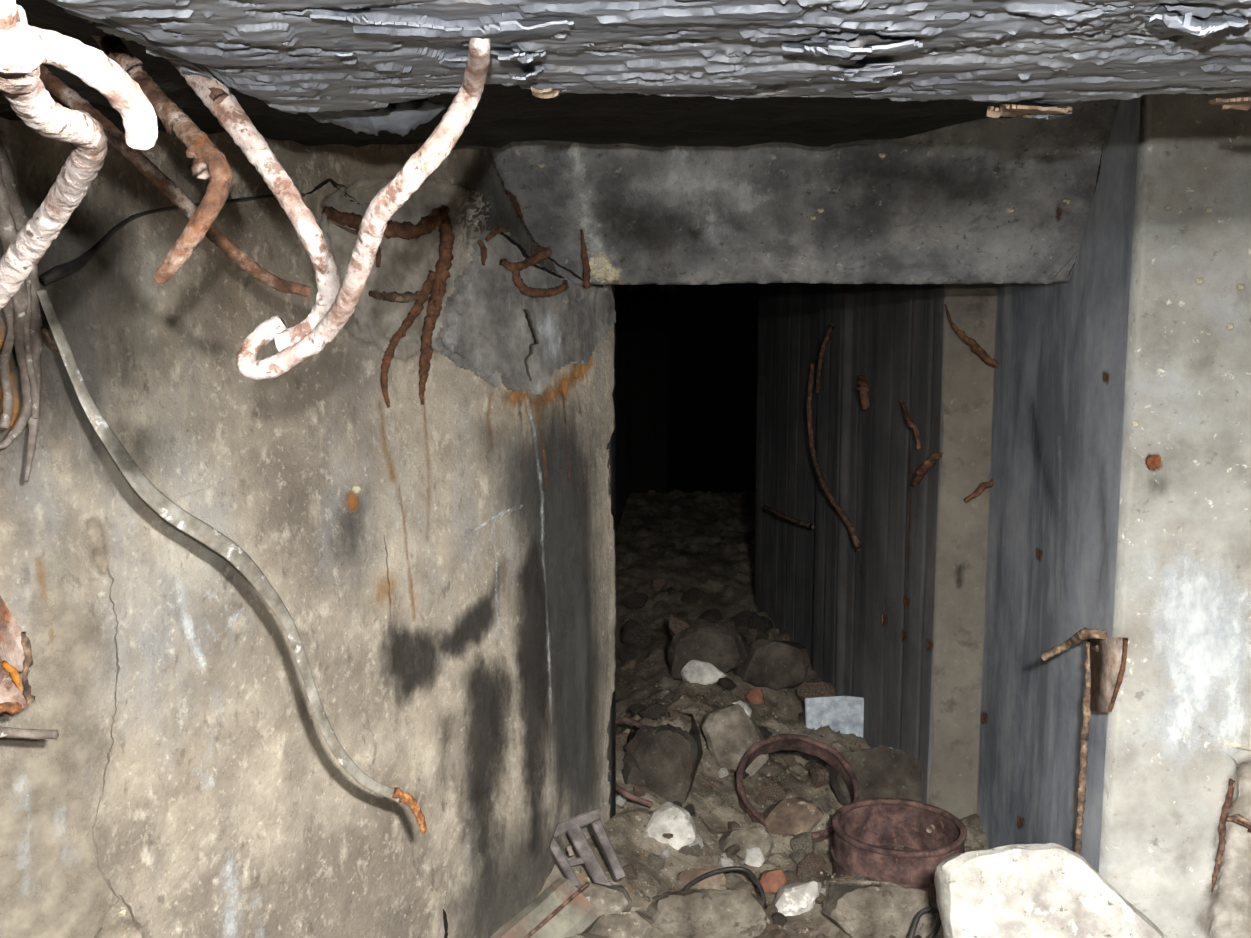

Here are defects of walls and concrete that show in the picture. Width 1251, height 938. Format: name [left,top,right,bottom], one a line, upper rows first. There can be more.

corrosion [108,45,147,77]
corrosion [208,81,228,106]
corrosion [186,145,210,179]
spalling [305,178,393,287]
spalling [343,179,616,395]
corrosion [0,373,17,428]
corrosion [510,356,592,421]
spalling [1198,758,1251,938]